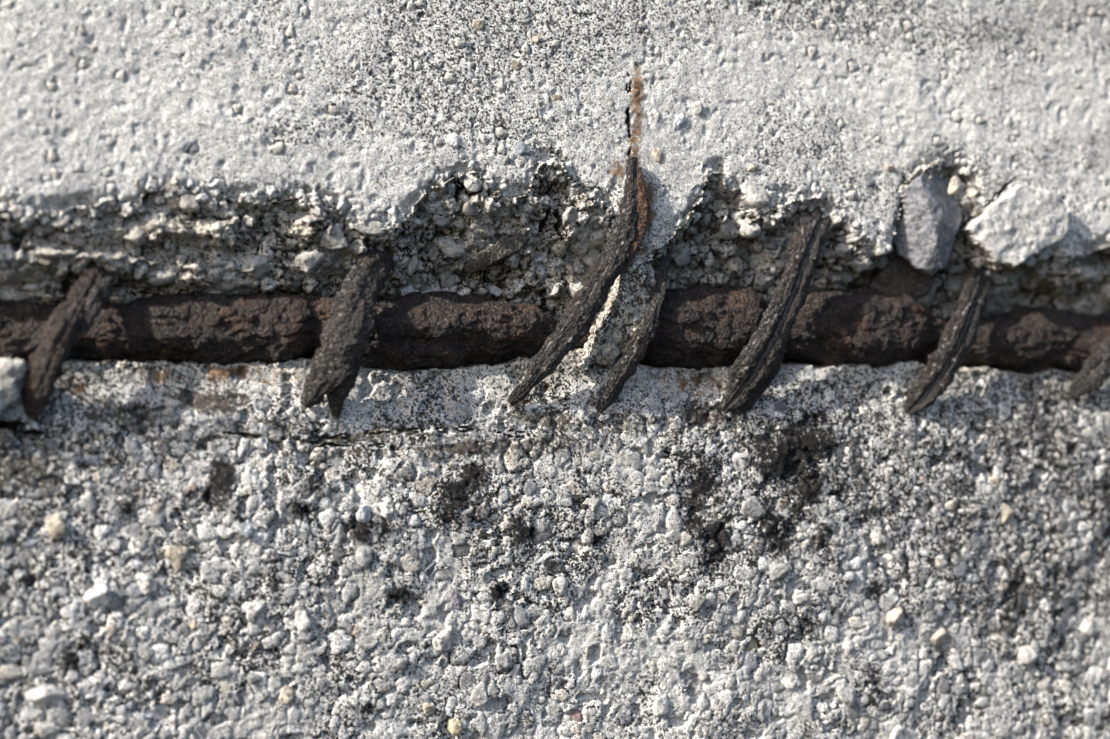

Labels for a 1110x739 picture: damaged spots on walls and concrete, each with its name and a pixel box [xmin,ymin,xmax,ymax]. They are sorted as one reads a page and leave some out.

rust [609,63,657,272]
spalling [0,157,618,323]
spalling [569,159,1110,372]
spalling [0,358,27,416]
spalling [66,352,315,368]
rust [202,365,284,384]
rust [627,368,724,396]
spalling [959,364,1077,376]